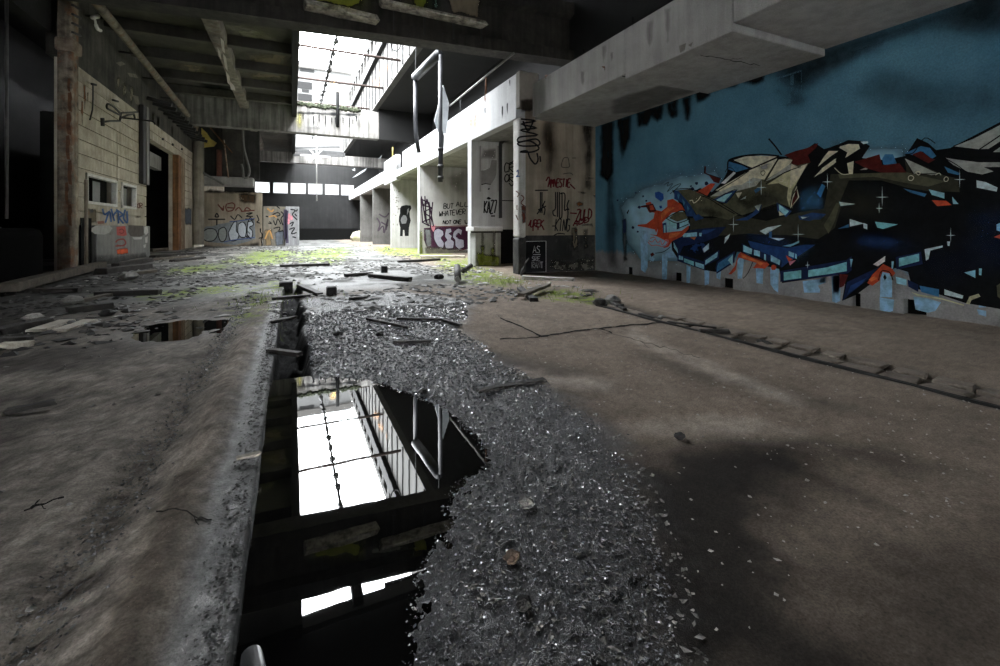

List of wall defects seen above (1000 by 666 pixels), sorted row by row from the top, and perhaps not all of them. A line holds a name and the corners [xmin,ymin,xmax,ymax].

crack [500,317,699,358]